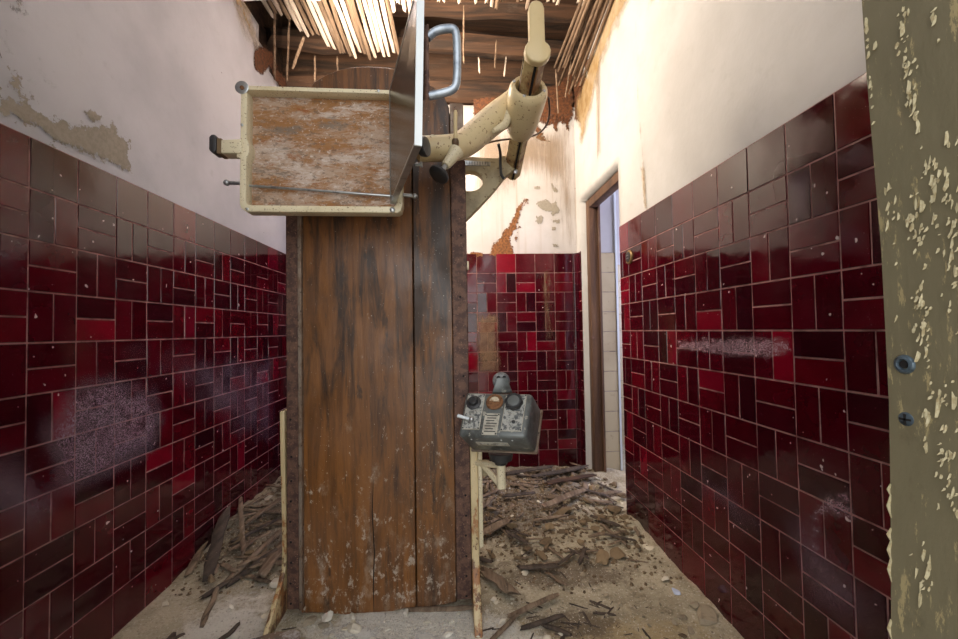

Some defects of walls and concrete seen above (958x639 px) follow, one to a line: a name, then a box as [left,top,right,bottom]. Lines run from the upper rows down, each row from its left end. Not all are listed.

peeling [0,65,131,172]
spalling [254,46,287,87]
spalling [472,97,496,115]
spalling [535,55,599,142]
peeling [864,17,877,60]
peeling [895,6,920,134]
peeling [884,146,958,313]
peeling [911,263,932,369]
damp [56,386,154,480]
peeling [921,380,958,519]